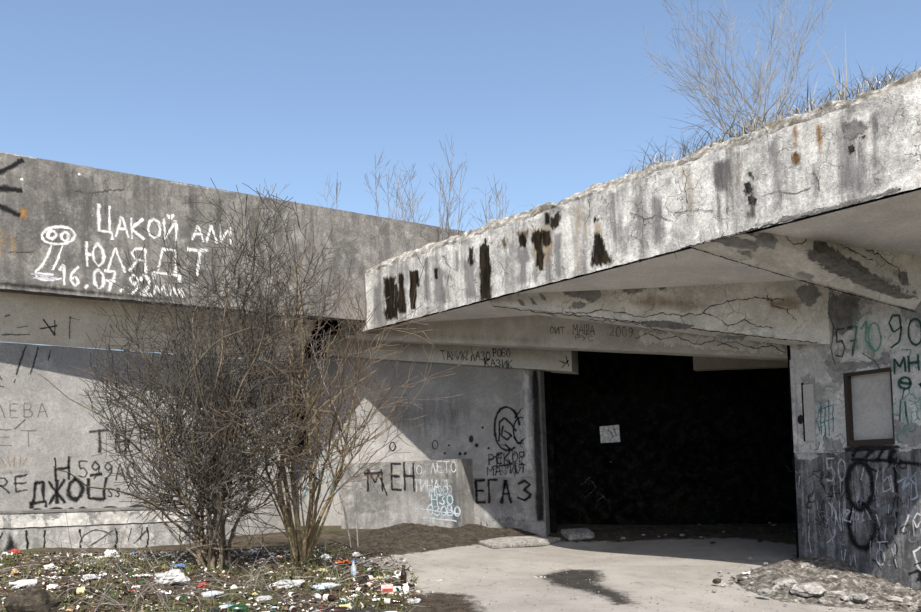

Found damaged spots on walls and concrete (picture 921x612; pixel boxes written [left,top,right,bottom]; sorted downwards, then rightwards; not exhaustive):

damp [714,161,731,215]
damp [374,261,449,321]
damp [456,238,492,300]
damp [517,211,561,283]
crack [493,167,915,365]